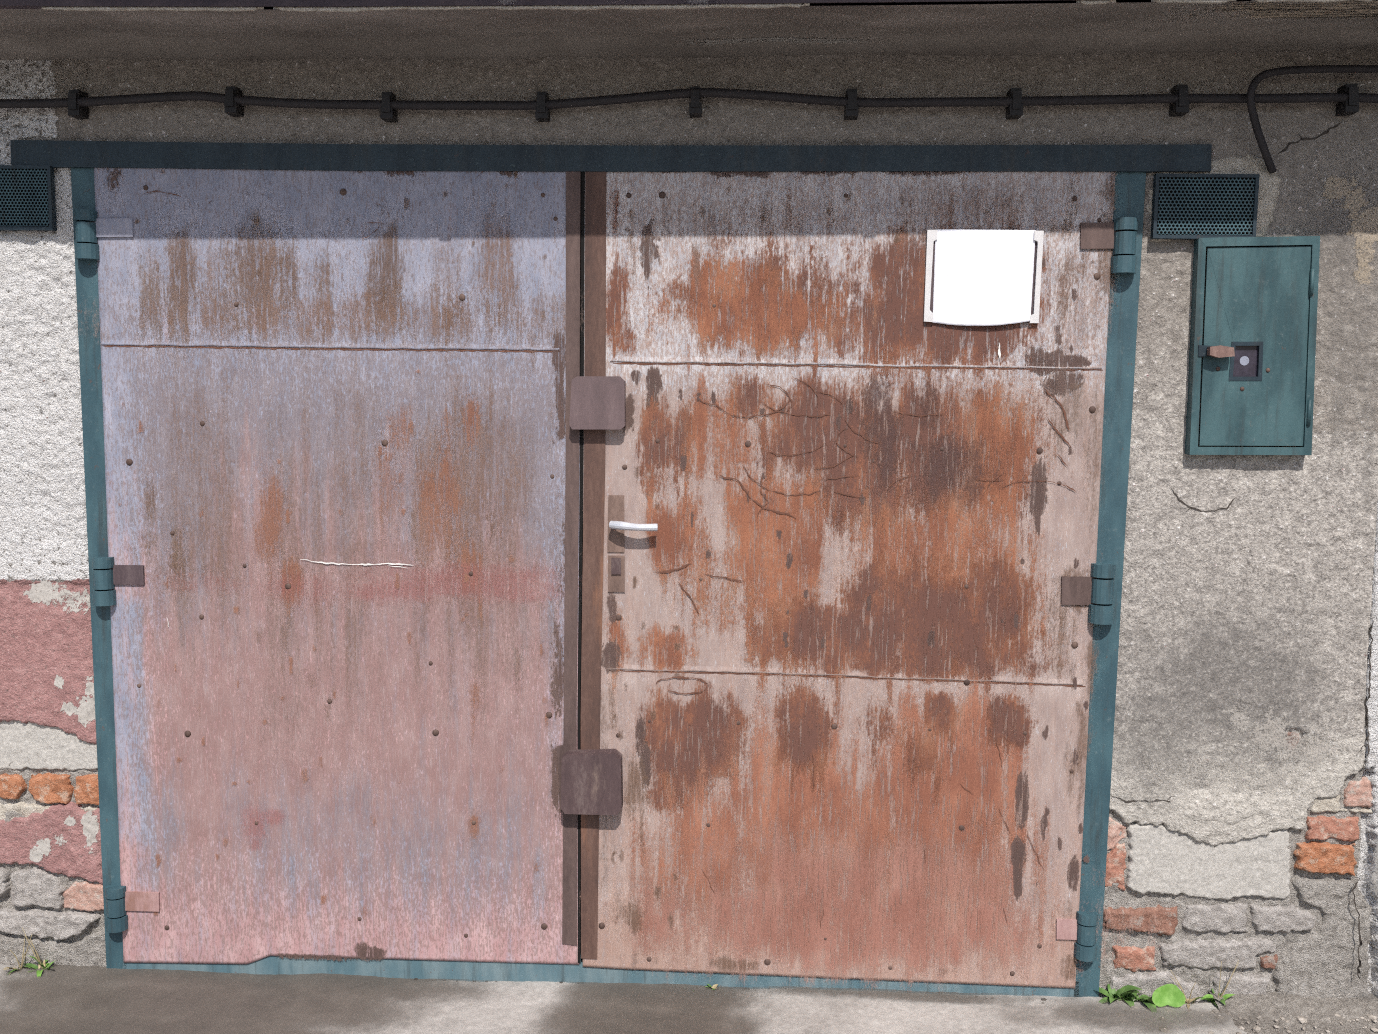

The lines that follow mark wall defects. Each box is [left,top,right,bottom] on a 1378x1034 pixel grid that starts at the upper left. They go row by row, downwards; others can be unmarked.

corrosion [140,213,566,444]
flaking render [0,675,106,967]
peeling [24,577,90,615]
corrosion [145,395,241,626]
corrosion [266,942,387,961]
corrosion [254,370,532,718]
corrosion [540,621,564,724]
corrosion [550,742,560,821]
corrosion [600,172,1115,983]
flaking render [1099,699,1378,1000]
crack [1347,878,1362,979]
crack [1360,621,1374,767]